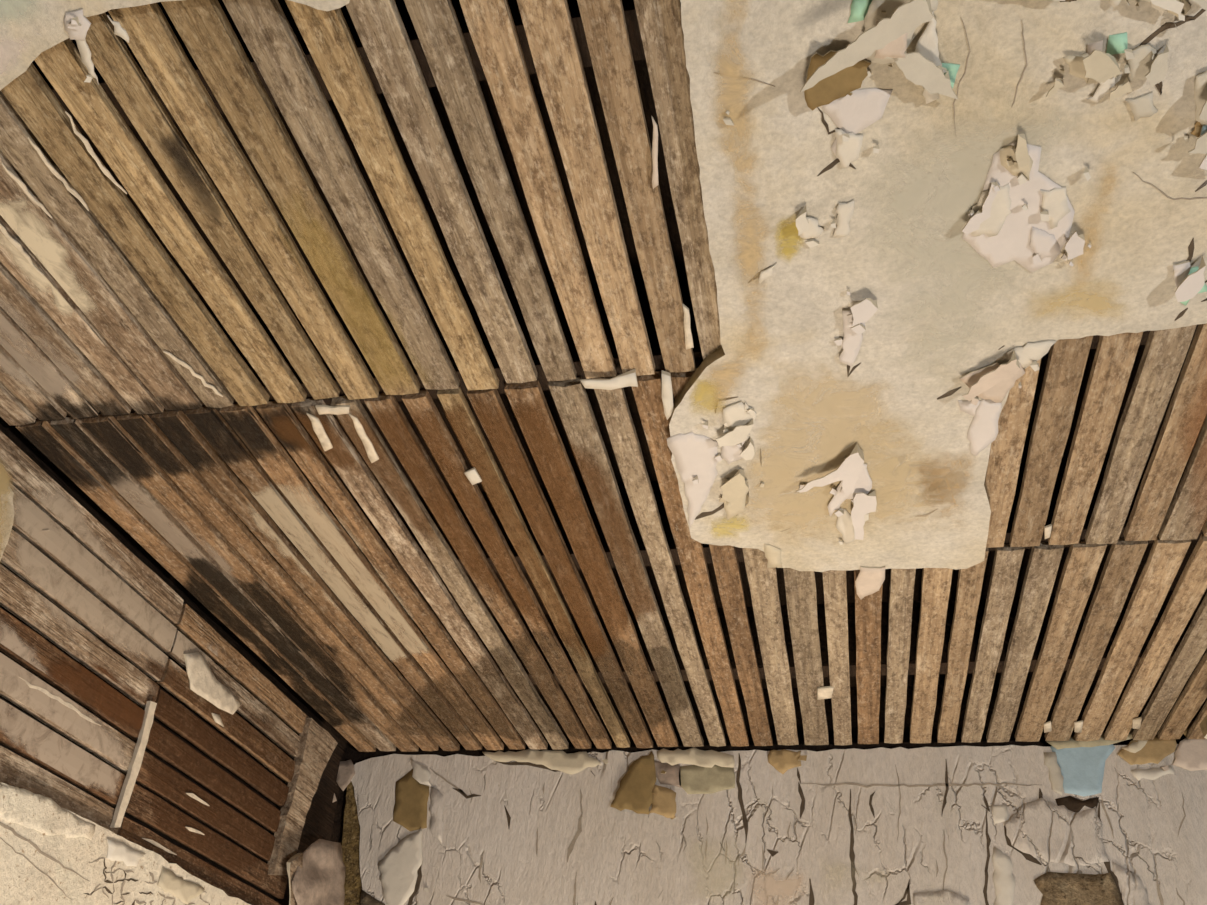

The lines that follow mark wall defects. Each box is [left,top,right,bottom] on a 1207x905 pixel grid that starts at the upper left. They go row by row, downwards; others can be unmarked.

peeling [800,0,960,176]
peeling [962,134,1091,273]
peeling [958,340,1056,456]
damp [0,305,653,727]
peeling [796,444,877,545]
damp [0,626,123,792]
peeling [0,784,146,867]
crack [0,822,210,905]
crack [430,768,538,855]
crack [567,789,613,905]
crack [705,754,1037,905]
crack [1096,796,1122,897]